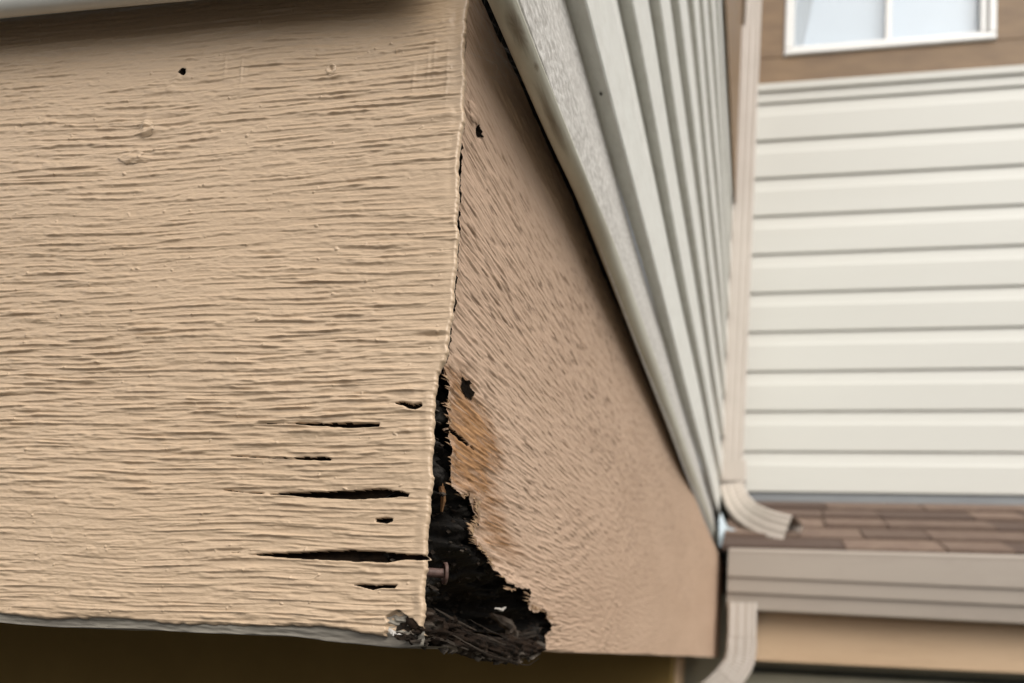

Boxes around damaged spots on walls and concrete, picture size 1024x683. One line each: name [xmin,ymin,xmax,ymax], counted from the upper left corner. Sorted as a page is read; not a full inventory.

crack [267,421,380,429]
peeling [447,373,509,546]
crack [230,489,409,524]
crack [238,550,430,590]